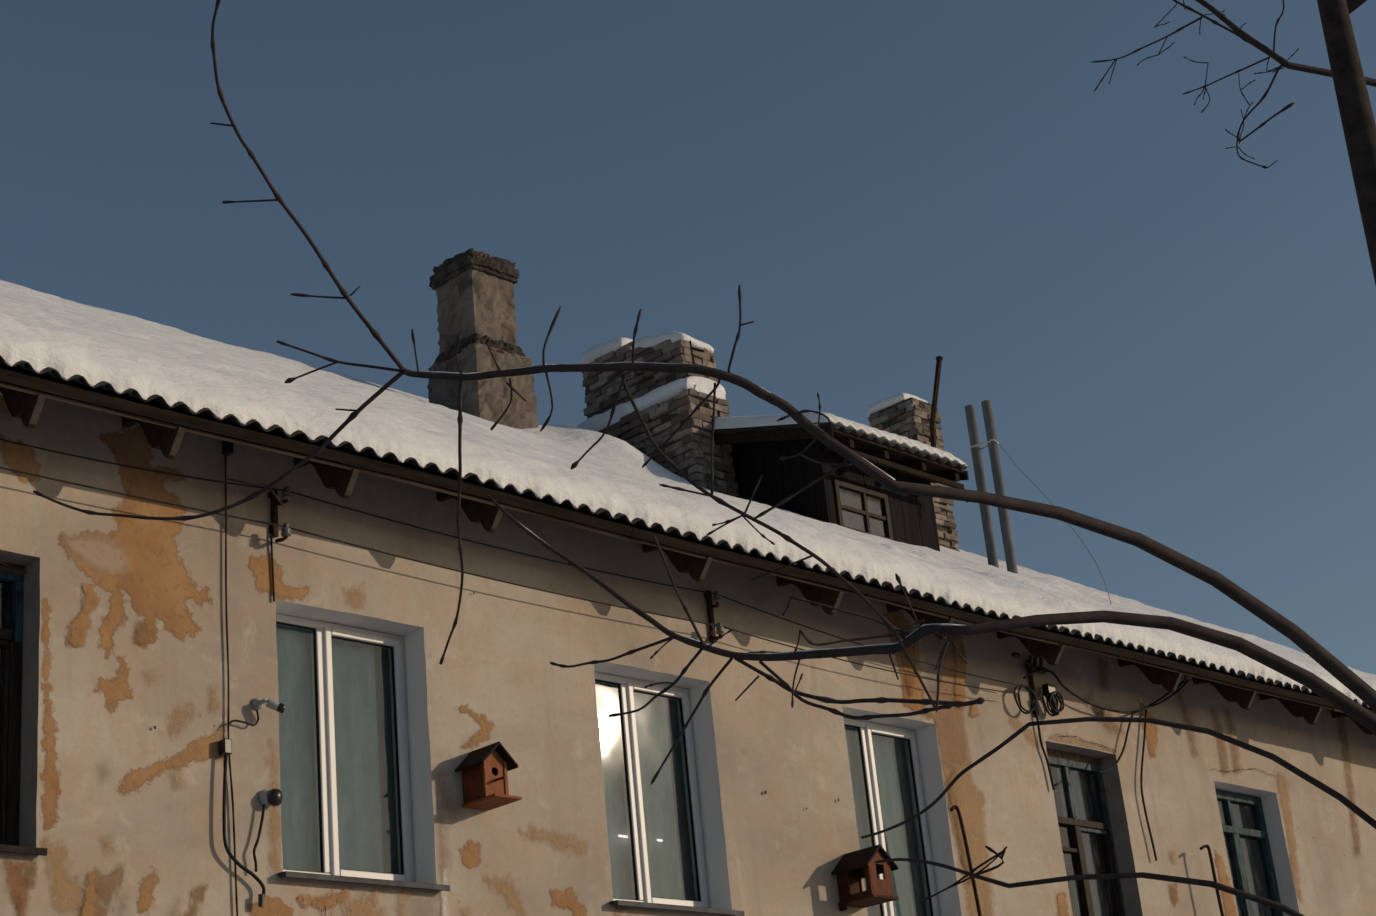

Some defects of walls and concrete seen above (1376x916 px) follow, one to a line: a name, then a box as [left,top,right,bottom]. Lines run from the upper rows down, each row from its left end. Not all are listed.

peeling [0,433,40,483]
peeling [249,553,310,601]
peeling [41,426,224,830]
peeling [460,705,494,749]
peeling [884,611,991,916]
peeling [247,889,385,916]
peeling [550,887,587,916]